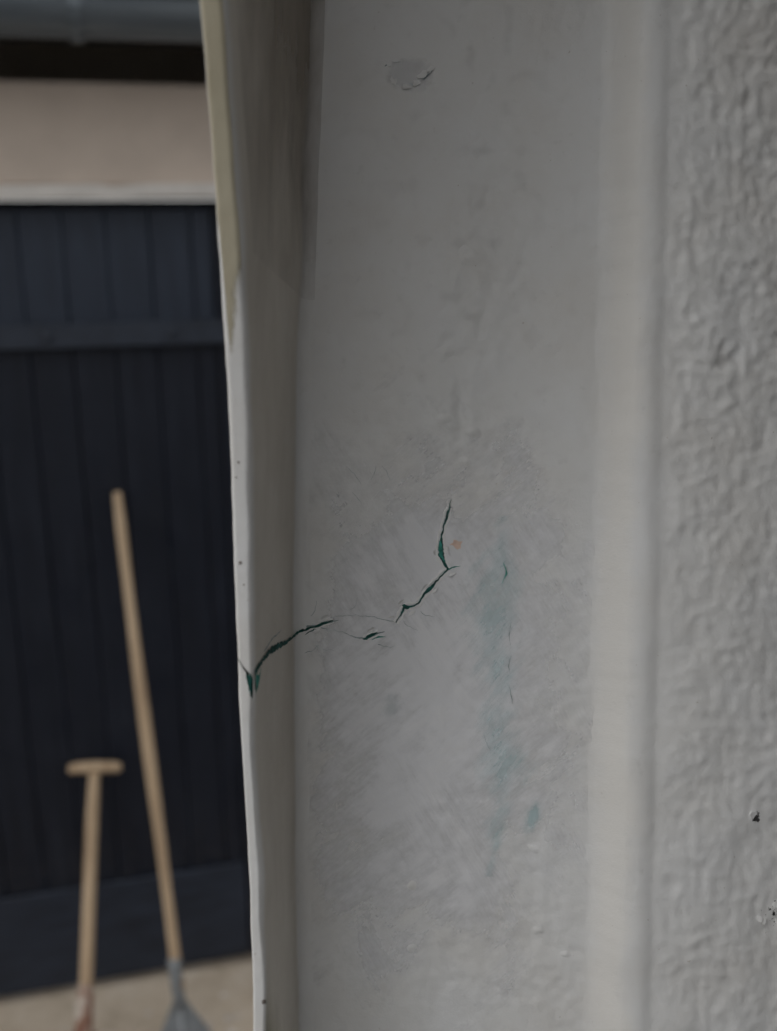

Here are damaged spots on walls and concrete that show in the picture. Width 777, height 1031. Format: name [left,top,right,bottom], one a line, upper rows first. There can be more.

crack [238,501,463,698]